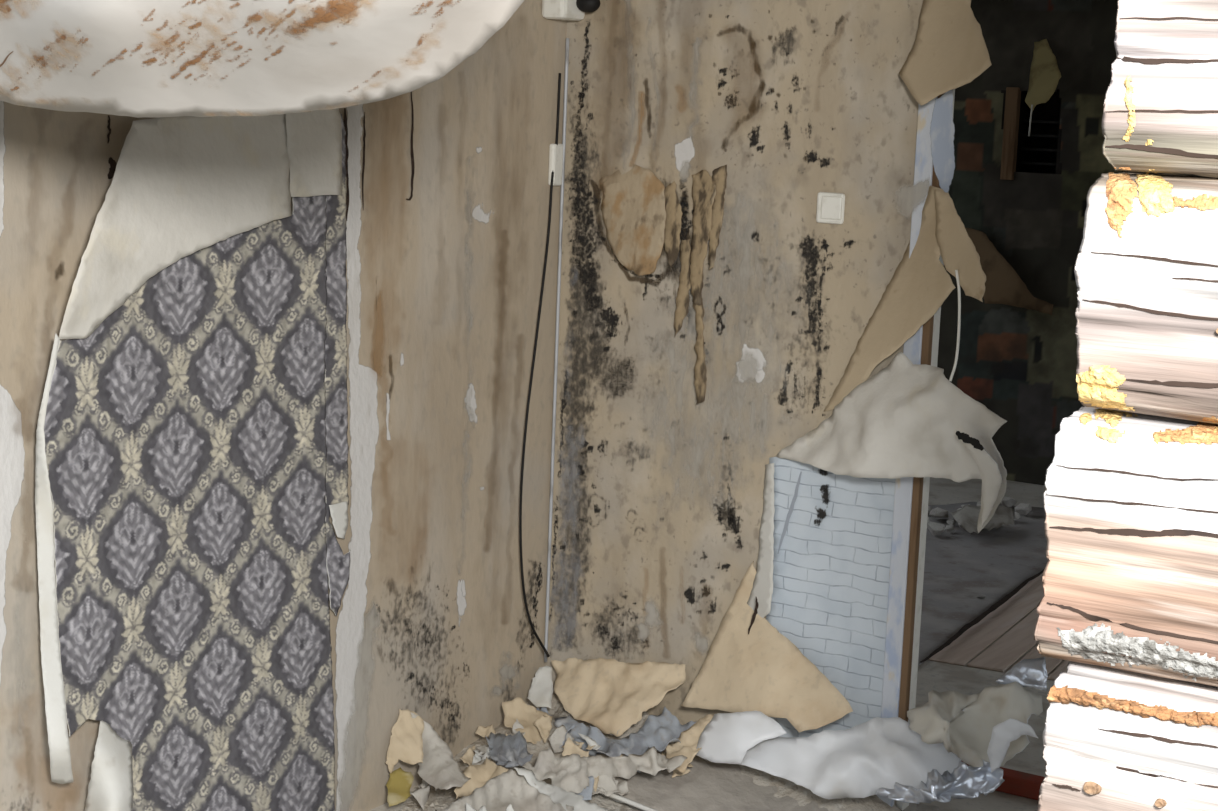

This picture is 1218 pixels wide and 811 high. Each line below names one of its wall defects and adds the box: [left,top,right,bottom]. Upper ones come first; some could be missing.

corrosion [27,32,88,77]
corrosion [92,0,367,78]
leakage [718,15,800,153]
leakage [805,125,830,168]
peeling [897,90,955,216]
leakage [494,23,783,701]
flaking render [0,385,25,683]
leakage [373,589,470,742]